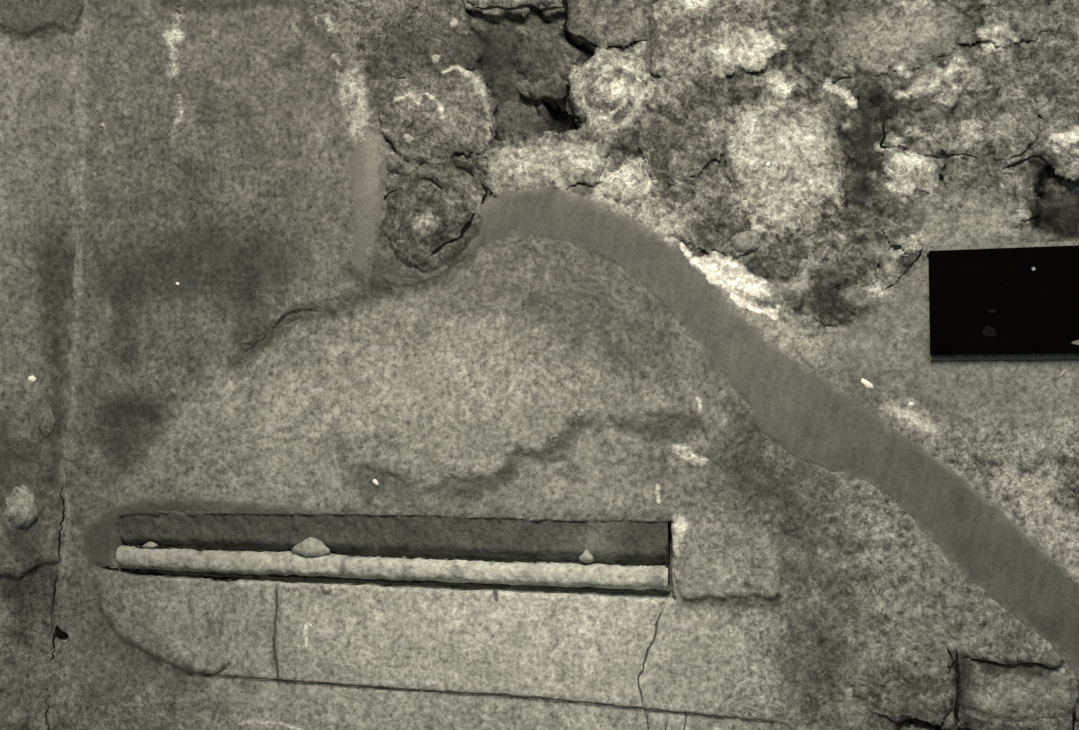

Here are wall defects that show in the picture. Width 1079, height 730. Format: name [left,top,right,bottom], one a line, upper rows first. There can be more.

crack [466,0,594,124]
crack [880,116,977,158]
crack [418,162,488,257]
water stain [923,197,1011,241]
water stain [597,177,826,372]
water stain [672,444,708,465]
water stain [880,400,941,436]
crack [0,482,65,659]
water stain [670,515,811,599]
water stain [992,464,1079,580]
crack [96,540,773,730]
crack [895,647,1076,730]